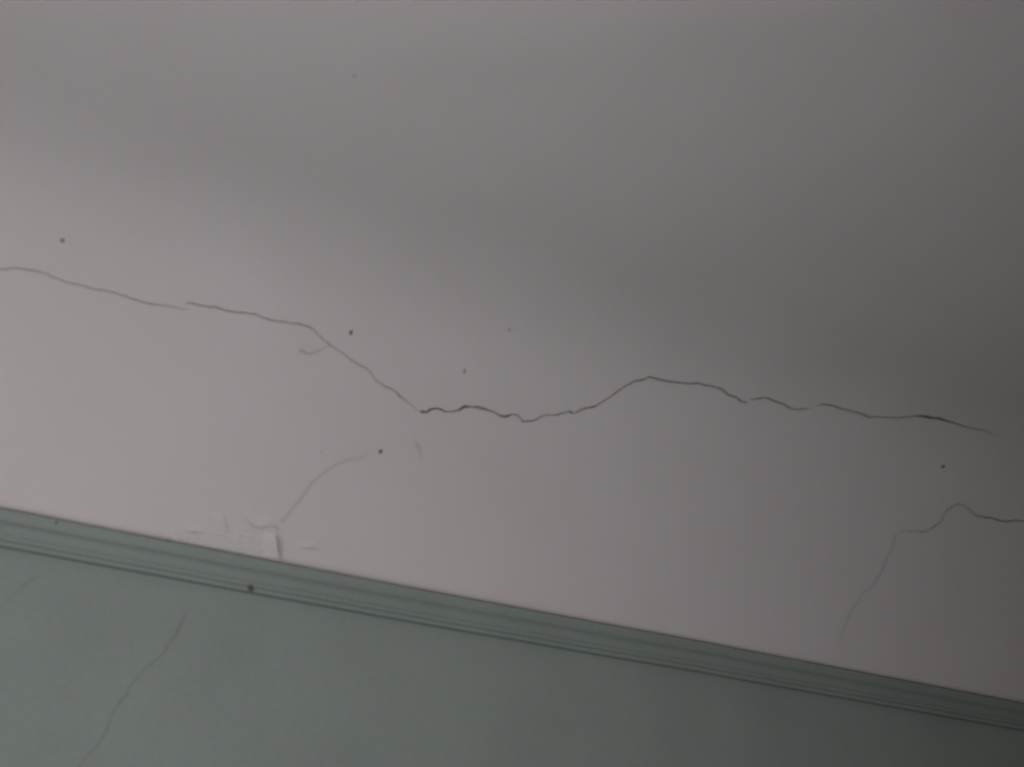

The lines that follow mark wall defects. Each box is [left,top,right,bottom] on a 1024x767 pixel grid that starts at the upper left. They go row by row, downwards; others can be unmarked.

crack [422,405,534,422]